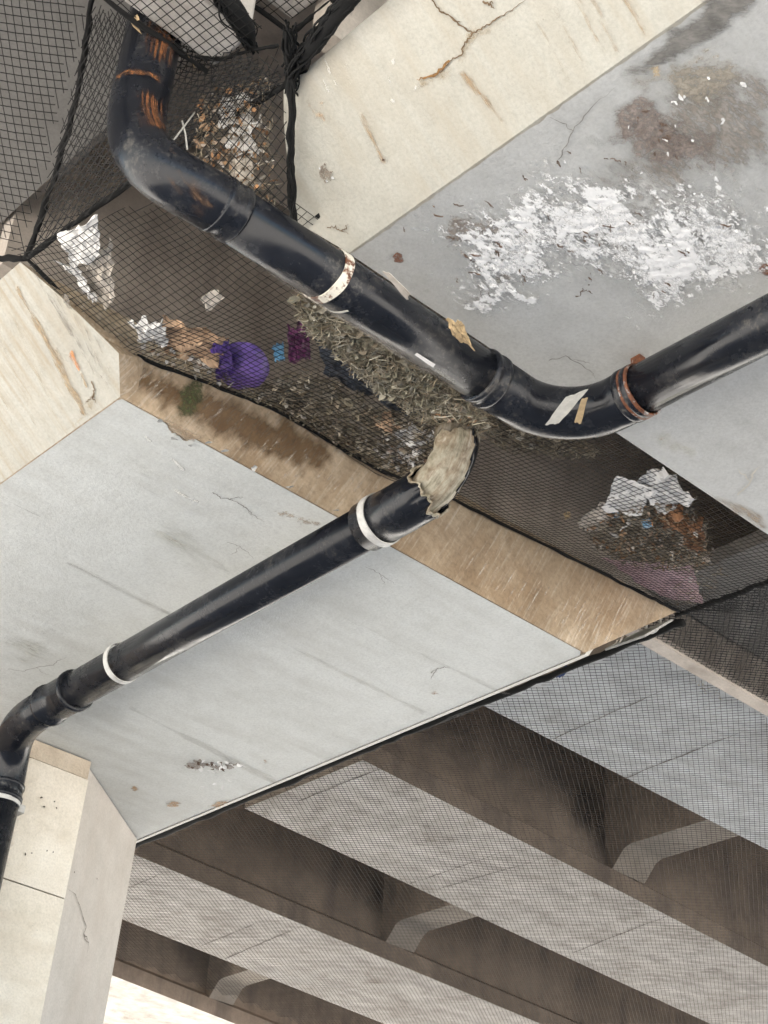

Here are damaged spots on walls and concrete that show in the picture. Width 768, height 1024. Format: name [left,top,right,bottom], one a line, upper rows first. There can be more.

crack [417,0,524,80]
corrosion [461,74,489,105]
crack [550,89,613,160]
water stain [620,0,768,214]
peeling [184,759,243,790]